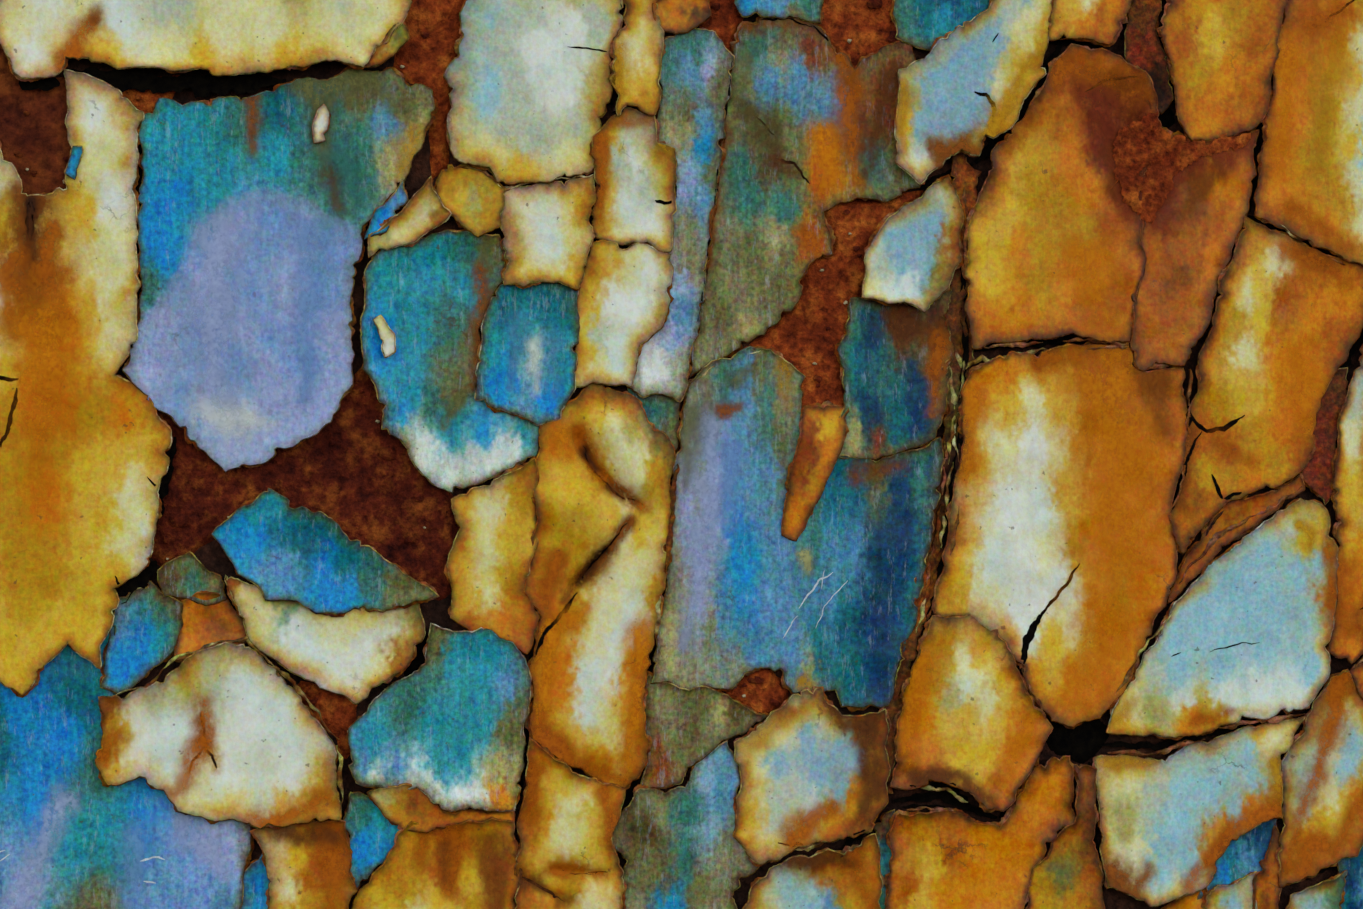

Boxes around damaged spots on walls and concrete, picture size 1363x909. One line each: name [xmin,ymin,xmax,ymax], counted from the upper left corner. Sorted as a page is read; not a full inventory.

corrosion [0,10,101,455]
corrosion [393,0,465,178]
corrosion [750,0,924,406]
corrosion [1109,38,1297,230]
crack [1330,0,1355,16]
corrosion [151,368,460,601]
peeling [0,0,680,909]
peeling [514,0,1363,909]
crack [921,266,1130,637]
crack [1171,411,1245,510]
crack [1018,563,1080,676]
crack [894,766,1035,819]